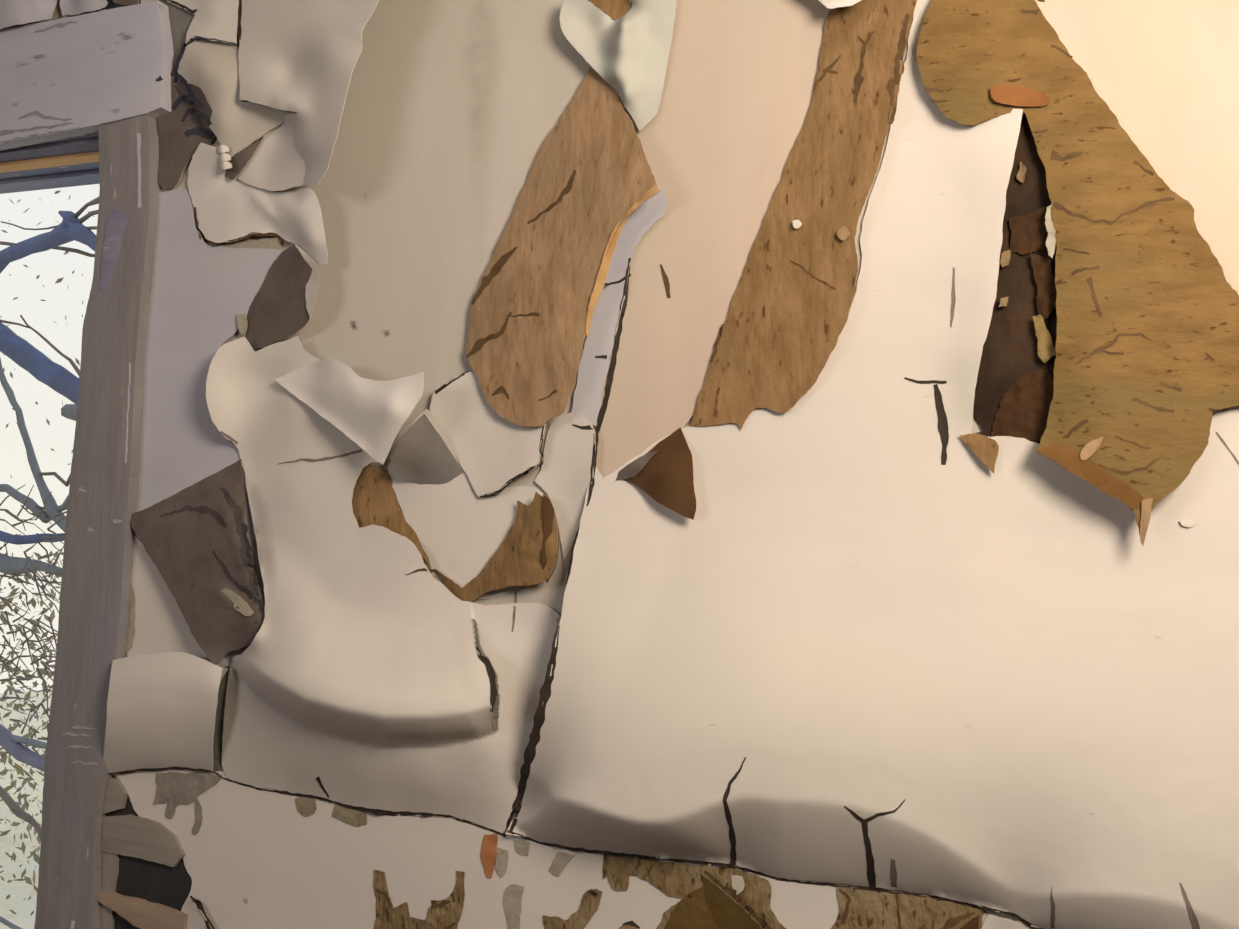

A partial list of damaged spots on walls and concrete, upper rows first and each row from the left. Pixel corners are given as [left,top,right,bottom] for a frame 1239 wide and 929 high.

peeling [0,0,108,30]
crack [165,0,242,83]
peeling [103,0,840,929]
peeling [513,0,1239,929]
crack [108,625,1055,929]
crack [1179,882,1200,929]